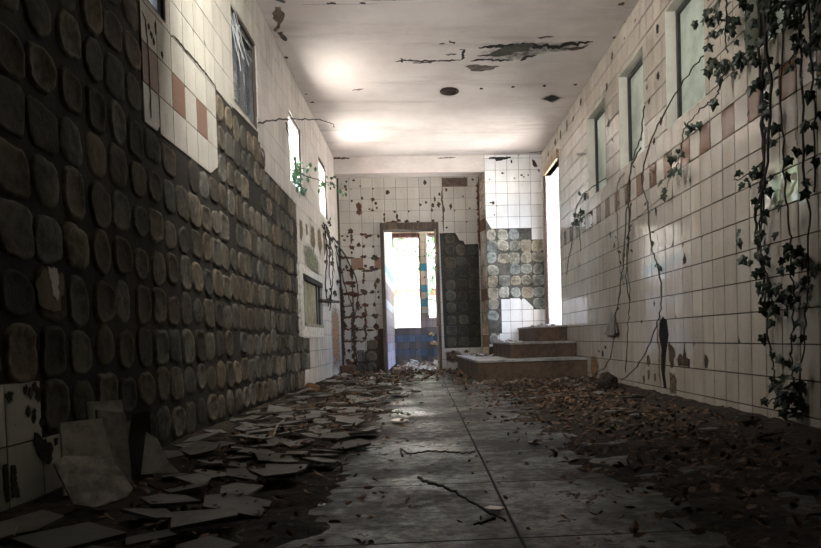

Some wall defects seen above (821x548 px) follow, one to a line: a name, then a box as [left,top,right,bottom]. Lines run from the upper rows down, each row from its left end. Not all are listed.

crack [396,36,593,64]
peeling [339,228,384,373]
spalling [351,197,420,223]
peeling [440,201,545,360]